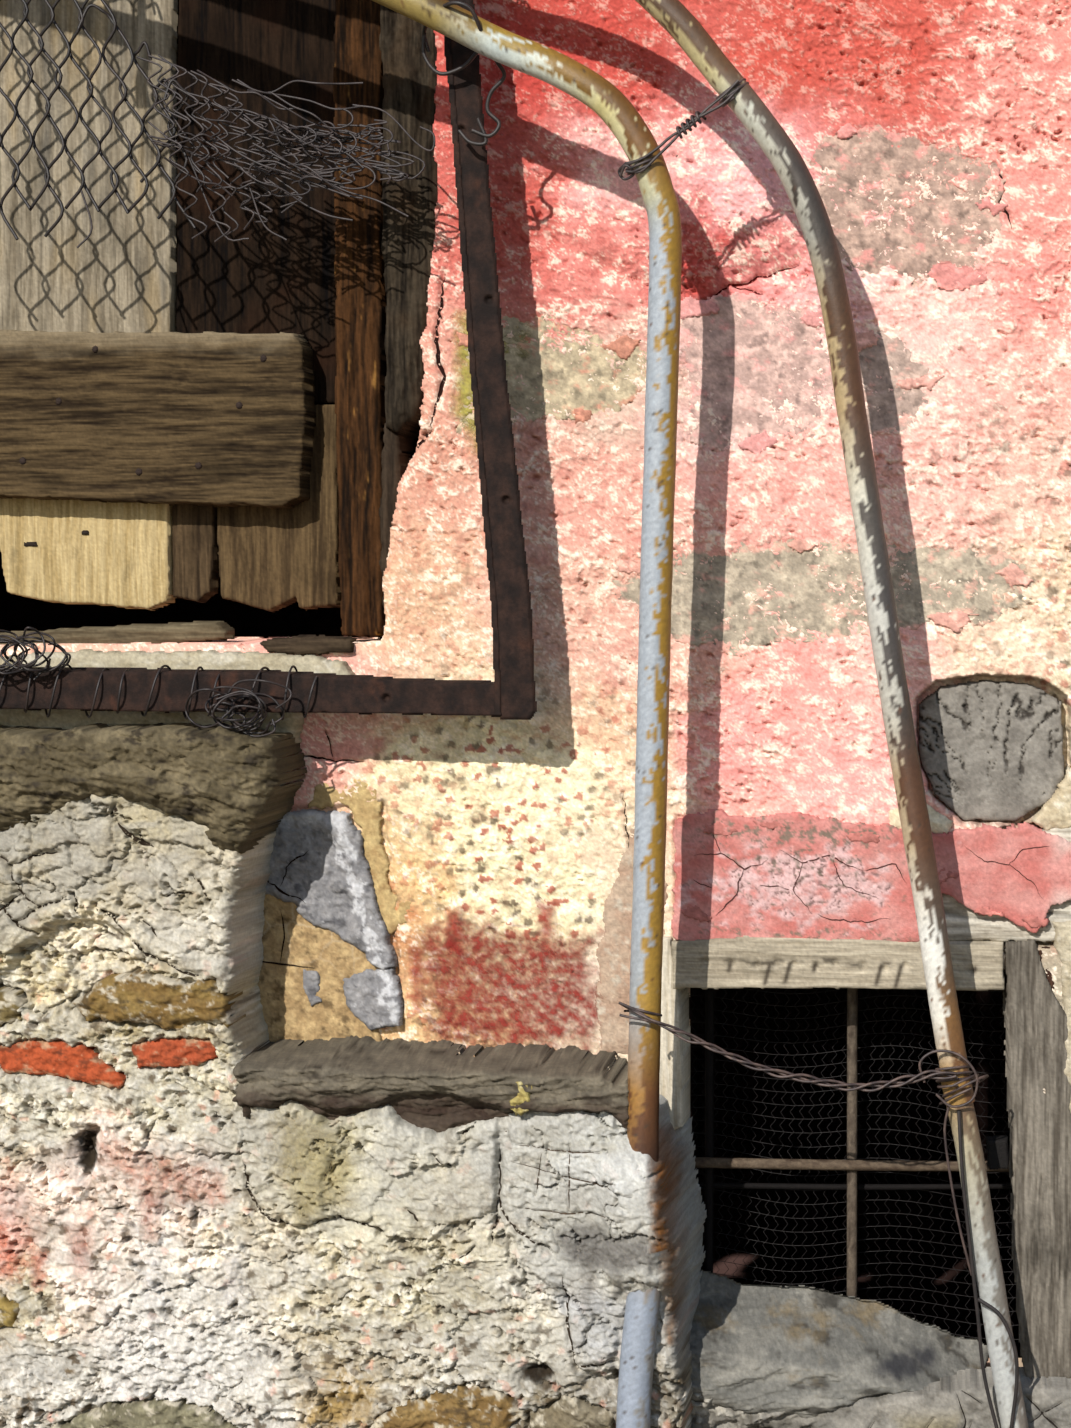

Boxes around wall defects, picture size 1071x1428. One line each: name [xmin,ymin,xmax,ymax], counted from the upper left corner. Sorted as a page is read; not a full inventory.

crack [417,277,446,448]
crack [0,852,210,976]
crack [110,806,154,847]
peeling [258,779,414,1045]
crack [694,835,904,923]
crack [970,846,1046,894]